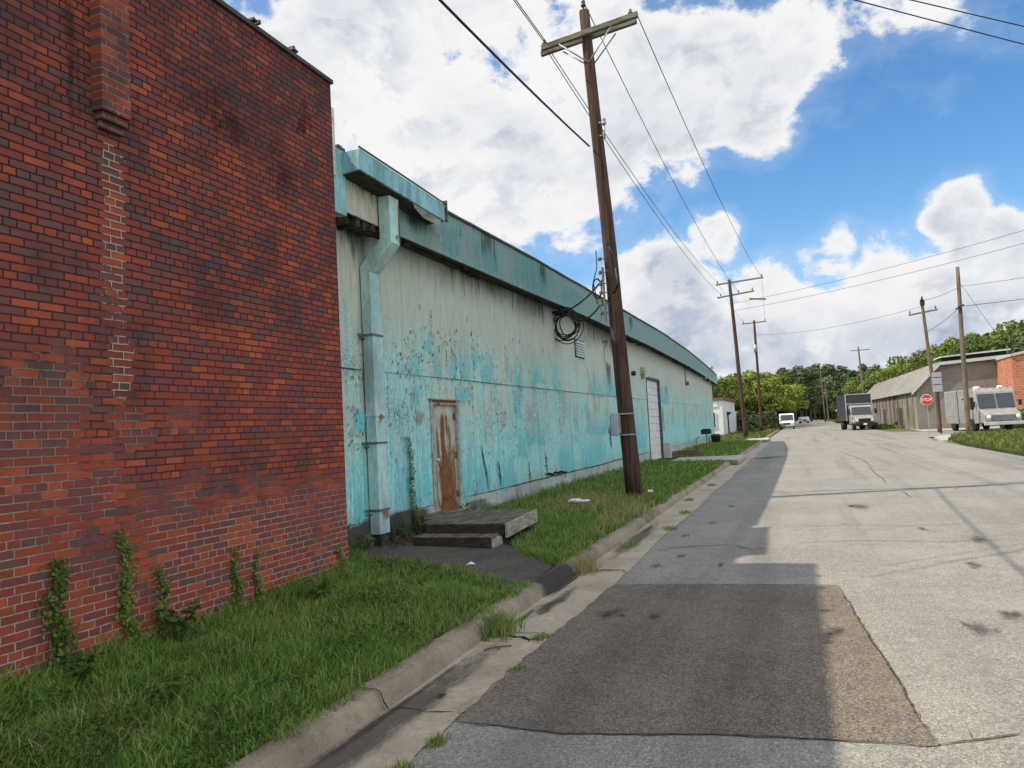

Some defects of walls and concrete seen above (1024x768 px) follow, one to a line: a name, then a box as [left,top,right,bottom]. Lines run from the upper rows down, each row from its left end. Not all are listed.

rust [432,400,458,510]
peeling [390,304,577,513]
peeling [635,382,669,451]